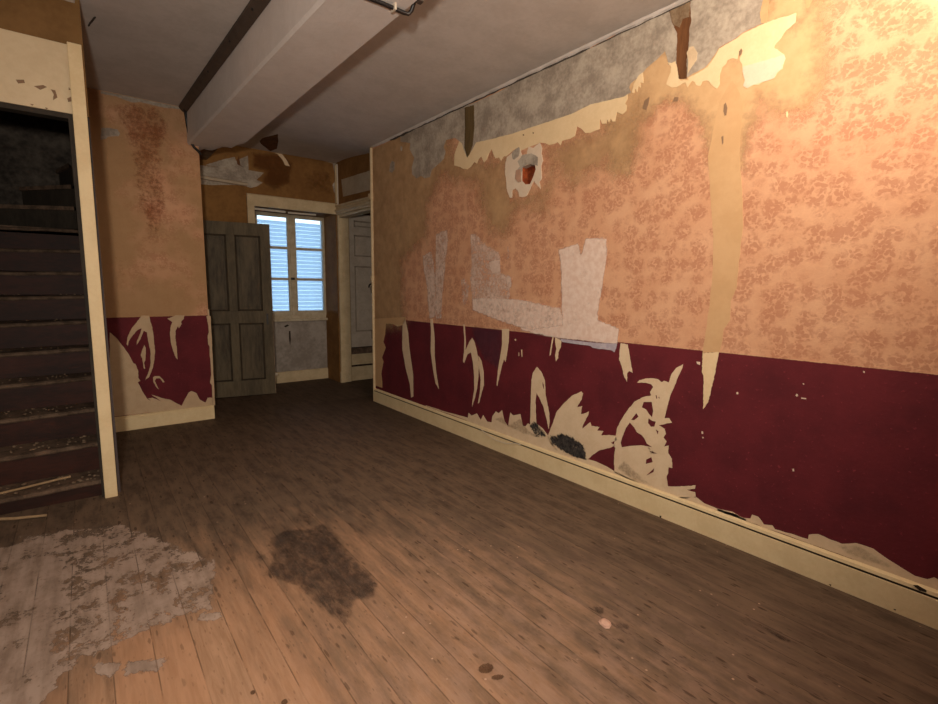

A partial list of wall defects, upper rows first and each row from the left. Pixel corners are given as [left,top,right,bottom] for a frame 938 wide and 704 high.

flaking render [400,0,769,179]
peeling [742,55,785,88]
flaking render [200,156,263,188]
spalling [260,134,278,151]
spalling [505,143,543,198]
peeling [110,315,215,416]
peeling [375,317,413,397]
peeling [426,319,938,592]